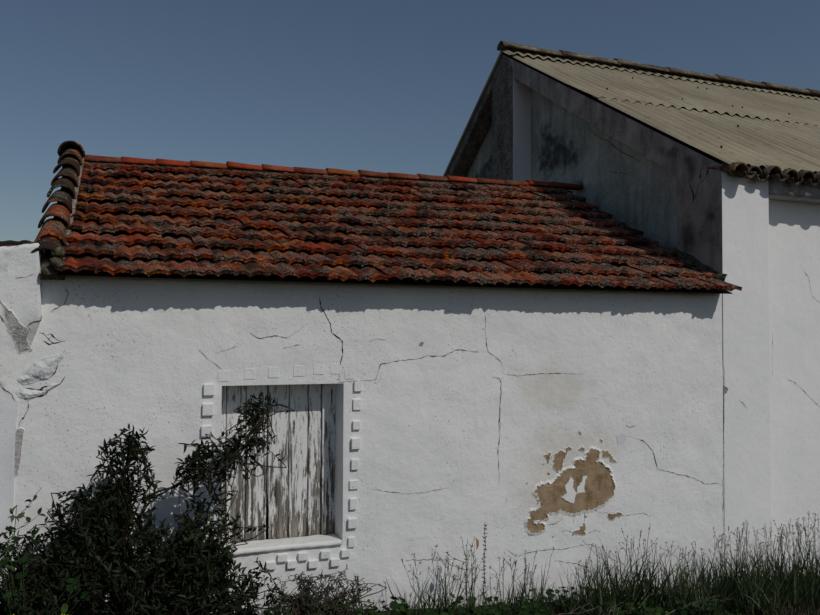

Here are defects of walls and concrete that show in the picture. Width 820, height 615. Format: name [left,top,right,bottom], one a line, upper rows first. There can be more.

crack [0,285,69,424]
crack [320,302,572,502]
peeling [523,438,623,537]
crack [626,371,746,501]